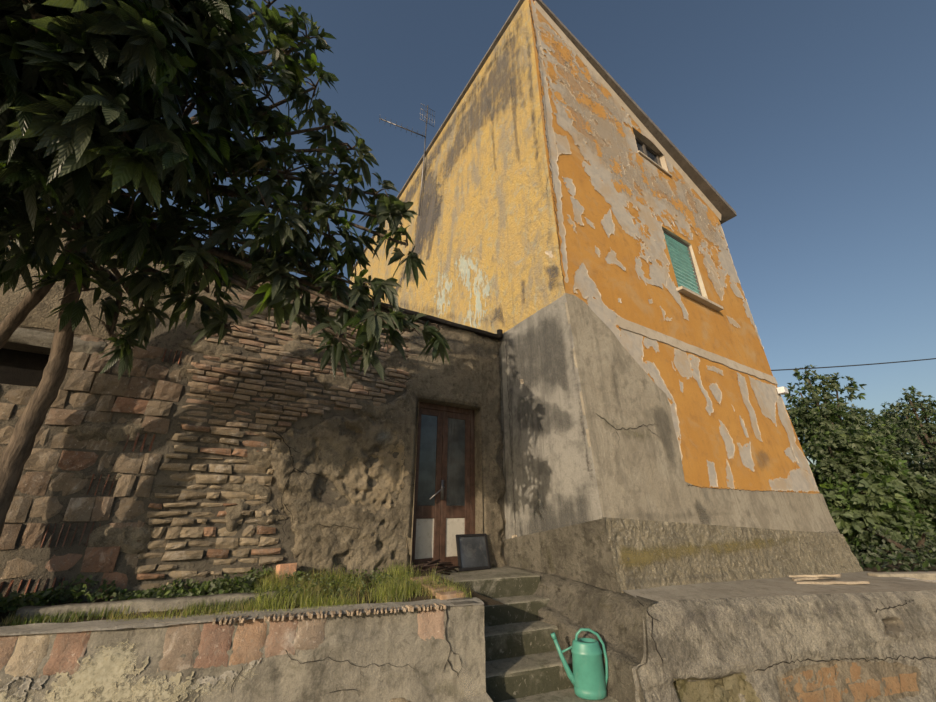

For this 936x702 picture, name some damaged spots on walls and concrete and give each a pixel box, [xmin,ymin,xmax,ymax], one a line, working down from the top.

water stain [396,34,521,291]
peeling [434,250,492,328]
water stain [547,266,558,290]
peeling [531,0,819,493]
water stain [499,321,567,389]
crack [272,428,321,552]
crack [874,600,914,613]
water stain [44,645,210,702]
flaking render [0,639,262,702]
crack [443,608,462,678]
crack [755,652,934,675]
spalling [776,659,921,702]